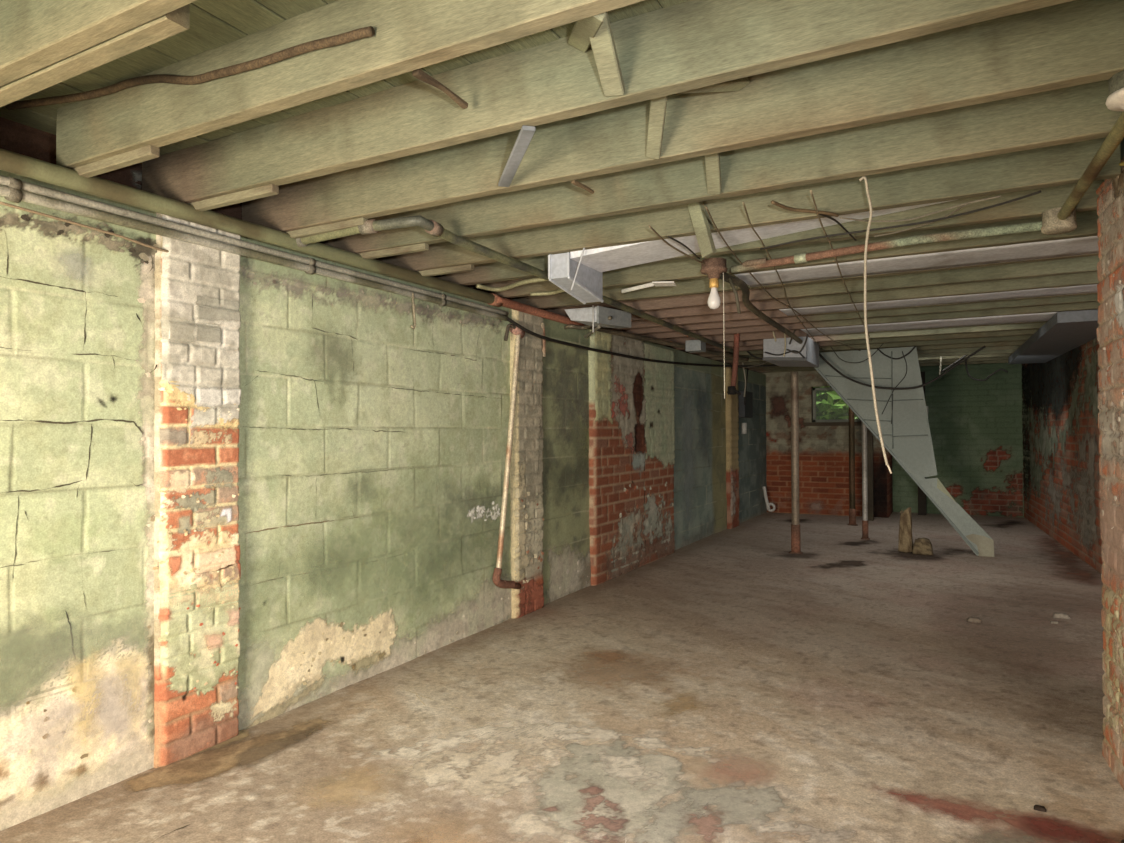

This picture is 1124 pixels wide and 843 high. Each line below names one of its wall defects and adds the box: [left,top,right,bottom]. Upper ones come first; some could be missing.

crack [3,233,157,373]
peeling [595,331,675,471]
crack [1,419,144,660]
peeling [0,209,591,830]
peeling [606,482,675,580]
peeling [946,338,1124,742]
water stain [126,715,331,791]
peeling [373,721,733,798]
peeling [513,786,629,843]